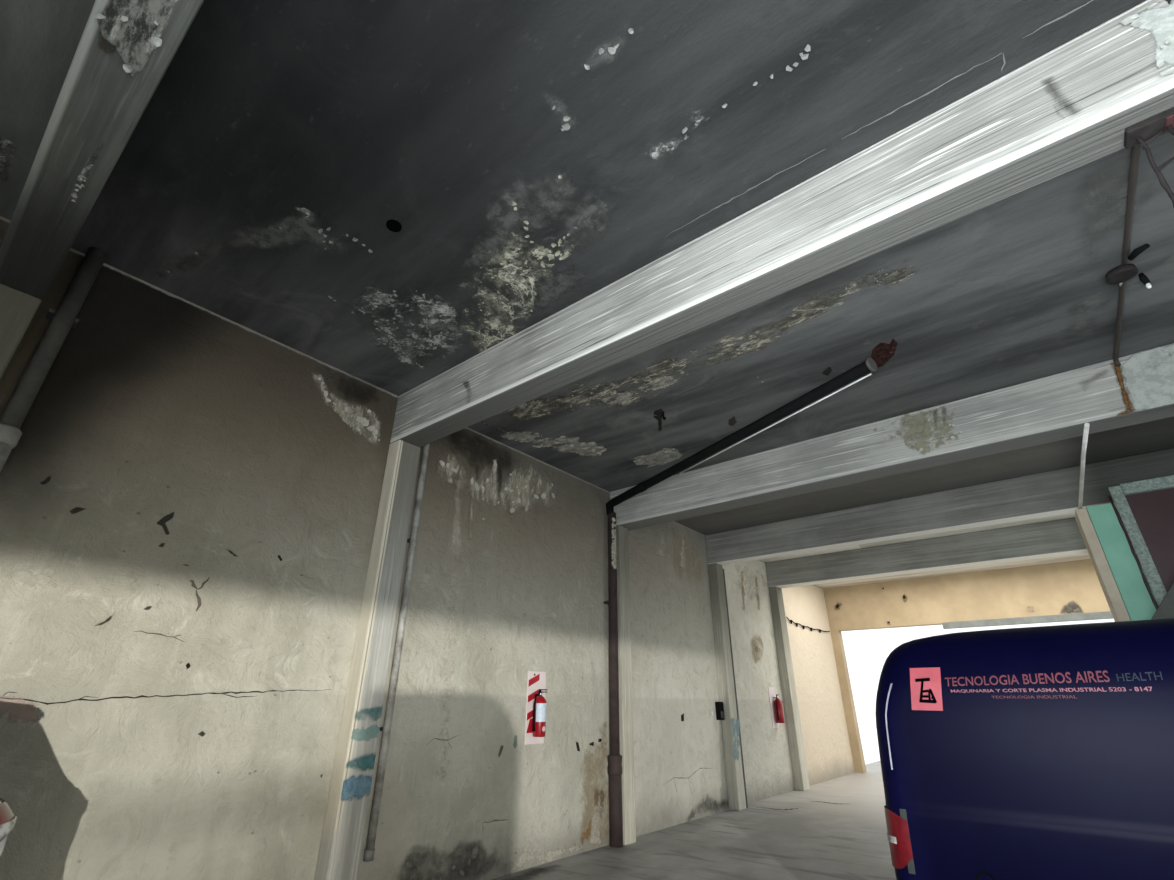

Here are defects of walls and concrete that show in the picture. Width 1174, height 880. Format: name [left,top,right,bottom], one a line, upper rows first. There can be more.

spalling [94,0,178,77]
peeling [786,44,810,71]
peeling [651,120,700,157]
peeling [483,267,915,457]
rust [1111,363,1134,416]
peeling [314,375,380,443]
damp [891,409,962,454]
peeling [631,448,683,467]
crack [0,689,330,705]
damp [403,843,494,880]
damp [512,868,547,880]